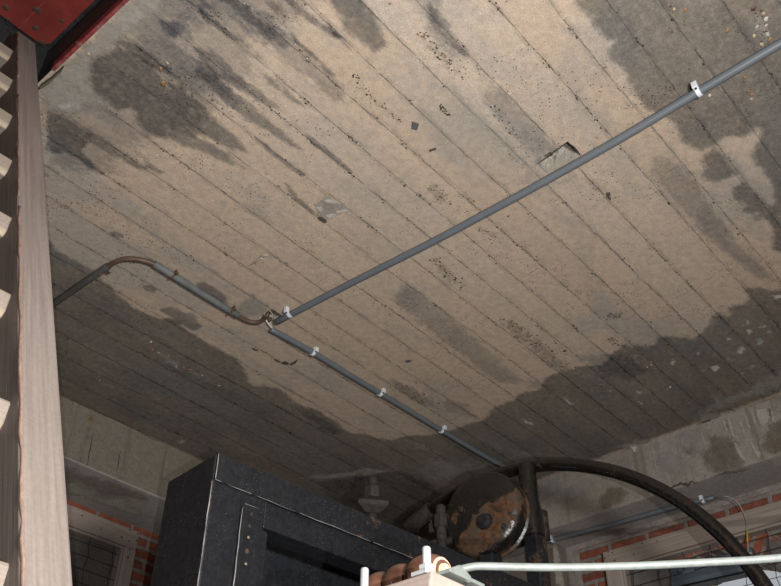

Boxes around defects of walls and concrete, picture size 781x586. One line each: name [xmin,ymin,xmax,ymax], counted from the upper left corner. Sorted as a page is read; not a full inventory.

spalling [534,142,581,174]
damp [693,370,781,461]